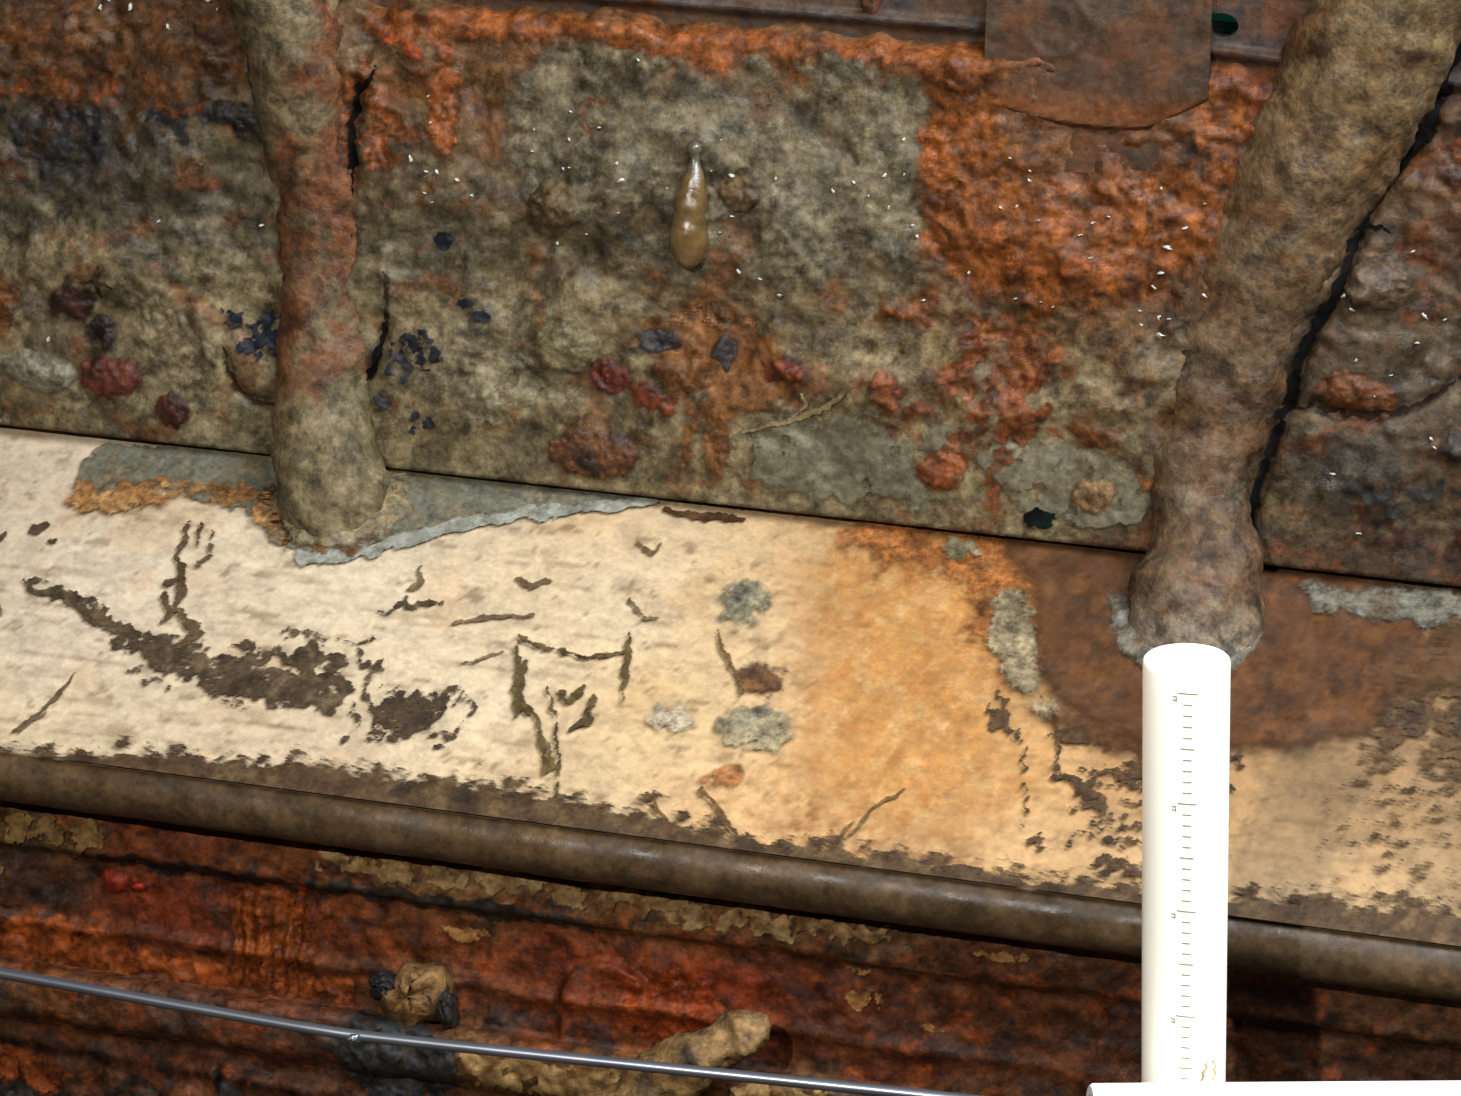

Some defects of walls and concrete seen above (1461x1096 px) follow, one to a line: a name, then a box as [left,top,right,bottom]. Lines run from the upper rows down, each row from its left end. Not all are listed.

crack [347,65,377,193]
crack [366,271,388,380]
rust [334,6,1258,516]
crack [1250,44,1461,525]
peeling [73,442,770,567]
peeling [22,576,191,690]
peeling [0,626,1142,904]
damp [699,661,794,789]
damp [985,689,1142,884]
peeling [1228,666,1461,946]
rust [1230,565,1461,750]
rust [0,887,359,1013]